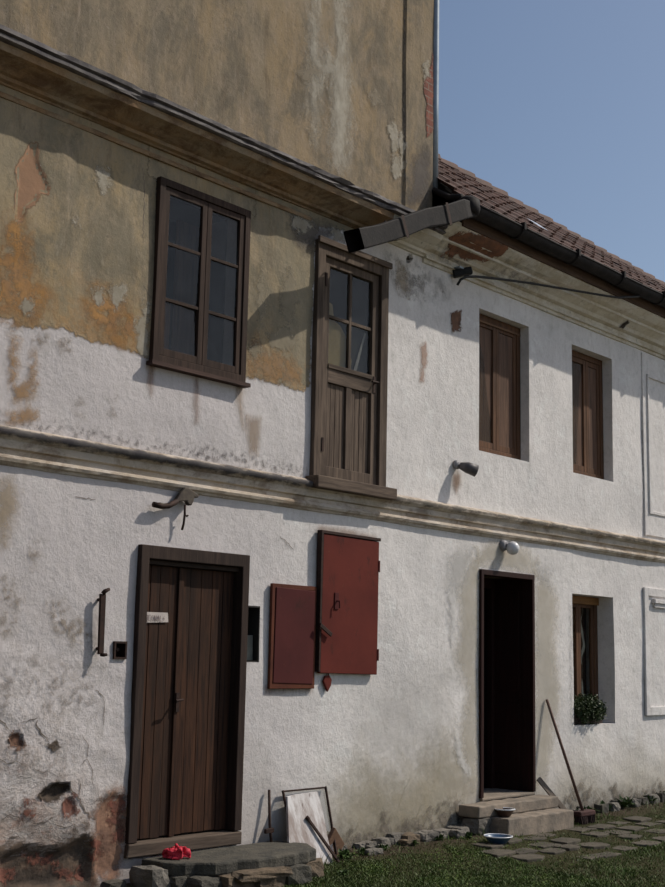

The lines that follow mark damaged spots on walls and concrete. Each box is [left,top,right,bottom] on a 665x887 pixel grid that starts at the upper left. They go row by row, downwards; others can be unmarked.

damp [310,0,351,167]
spalling [422,53,433,137]
peeling [387,121,408,180]
peeling [0,84,353,392]
spalling [440,230,508,263]
spalling [451,310,462,332]
spalling [8,731,27,763]
crack [0,717,50,743]
crack [2,737,97,838]
spalling [0,779,128,887]